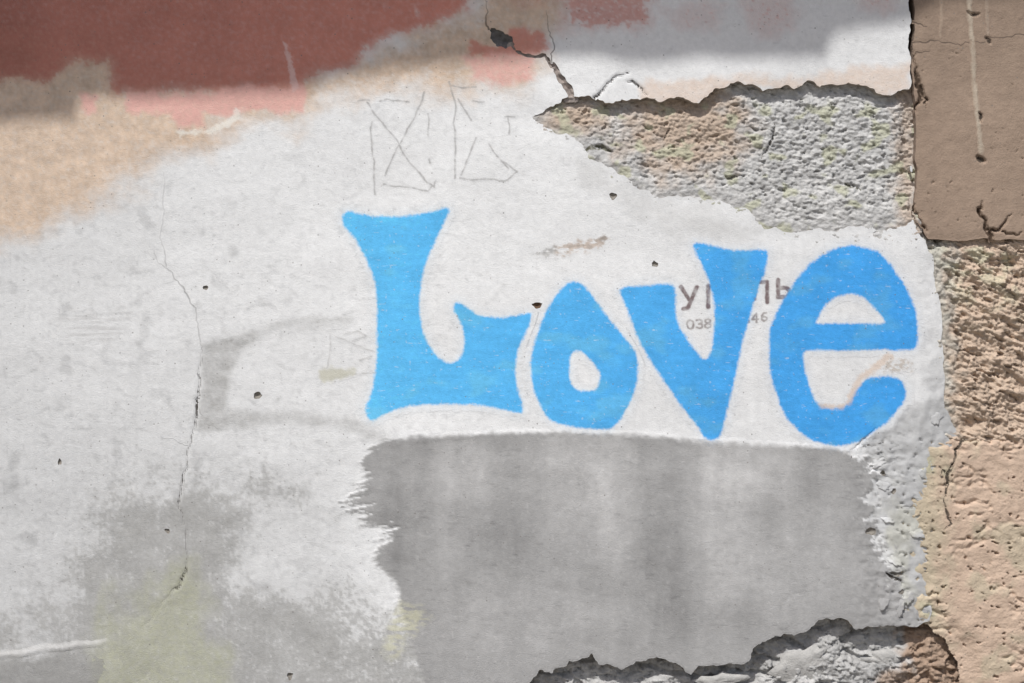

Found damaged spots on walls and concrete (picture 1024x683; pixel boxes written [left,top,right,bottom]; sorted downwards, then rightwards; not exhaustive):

crack [485,0,648,102]
spalling [533,82,1024,444]
crack [976,204,1022,242]
crack [113,172,222,683]
spalling [865,517,895,535]
peeling [869,456,898,494]
peeling [884,555,902,577]
crack [939,439,968,530]
spalling [530,589,959,683]